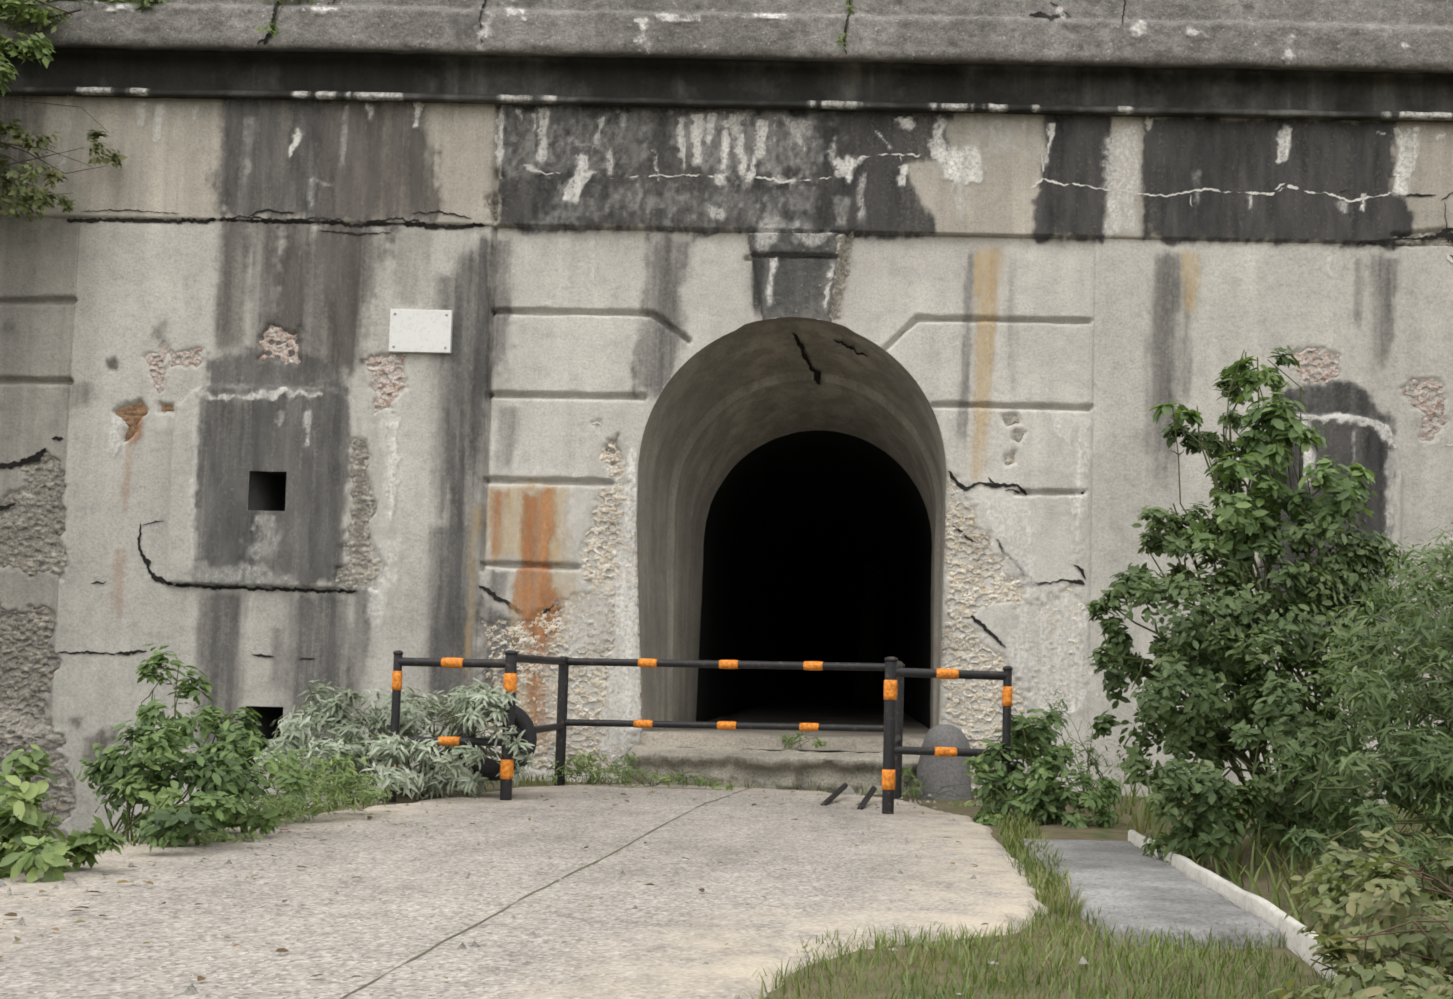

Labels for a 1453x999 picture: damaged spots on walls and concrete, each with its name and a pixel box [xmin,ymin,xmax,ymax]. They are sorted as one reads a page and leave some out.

spalling [0,604,61,739]
spalling [0,452,68,578]
crack [137,520,357,594]
leakage [192,91,440,768]
rust [493,484,564,717]
spalling [477,421,642,780]
leakage [430,95,982,712]
crack [792,333,868,385]
spalling [940,472,1092,792]
leakage [1022,105,1452,451]
crack [1031,155,1453,263]
leakage [1256,381,1396,626]